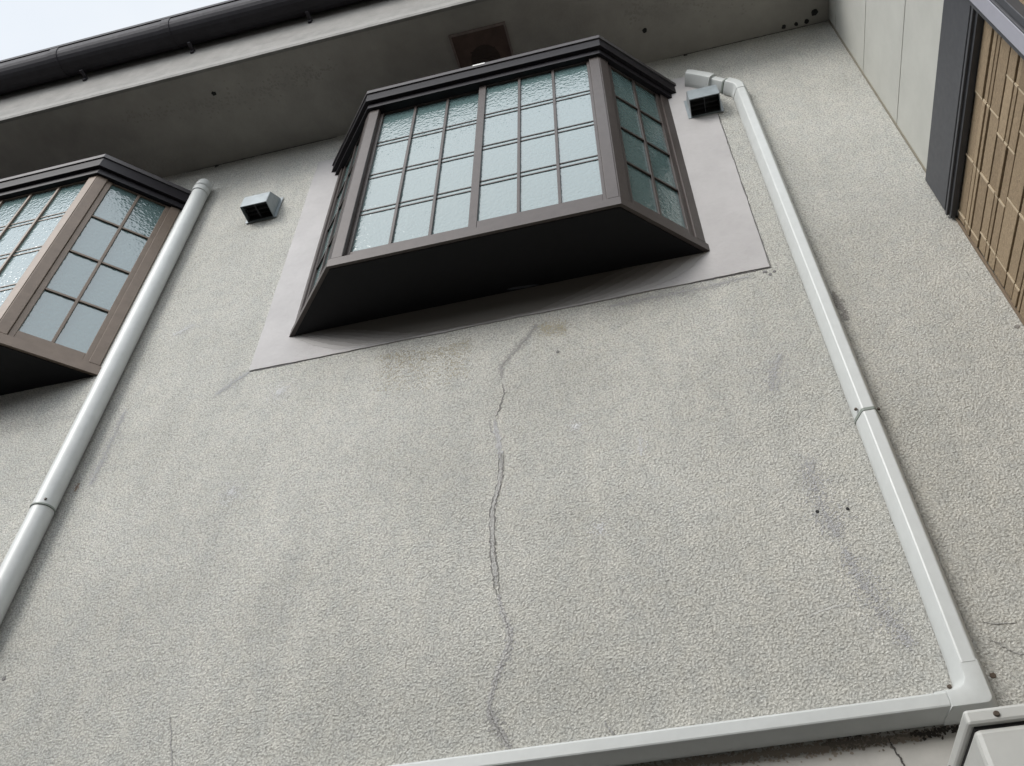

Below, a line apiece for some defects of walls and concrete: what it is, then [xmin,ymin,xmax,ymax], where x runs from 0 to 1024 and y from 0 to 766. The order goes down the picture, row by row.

crack [487,325,535,747]